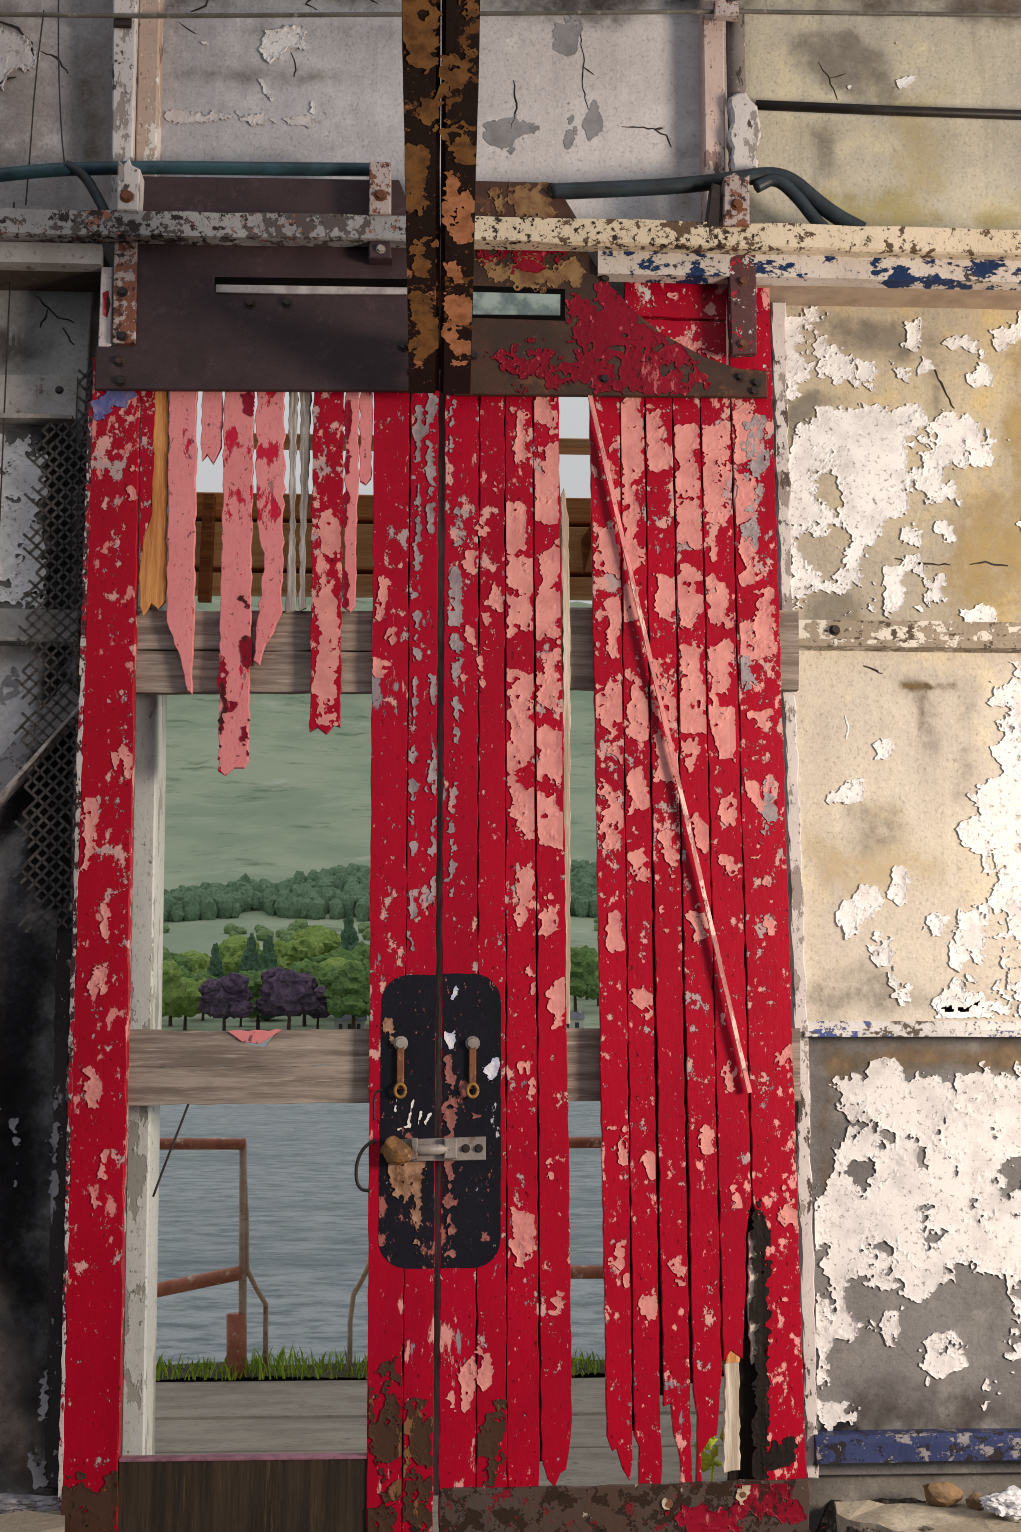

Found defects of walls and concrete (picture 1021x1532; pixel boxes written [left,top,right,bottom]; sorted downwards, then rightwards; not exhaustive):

peeling [0,434,48,609]
peeling [372,393,454,857]
peeling [458,397,563,850]
peeling [593,306,1021,883]
peeling [27,402,109,1501]
peeling [513,862,559,939]
peeling [835,865,913,1006]
peeling [923,661,1021,1018]
peeling [380,1145,458,1261]
peeling [445,1341,494,1413]
peeling [508,1207,537,1268]
peeling [777,1057,1021,1431]